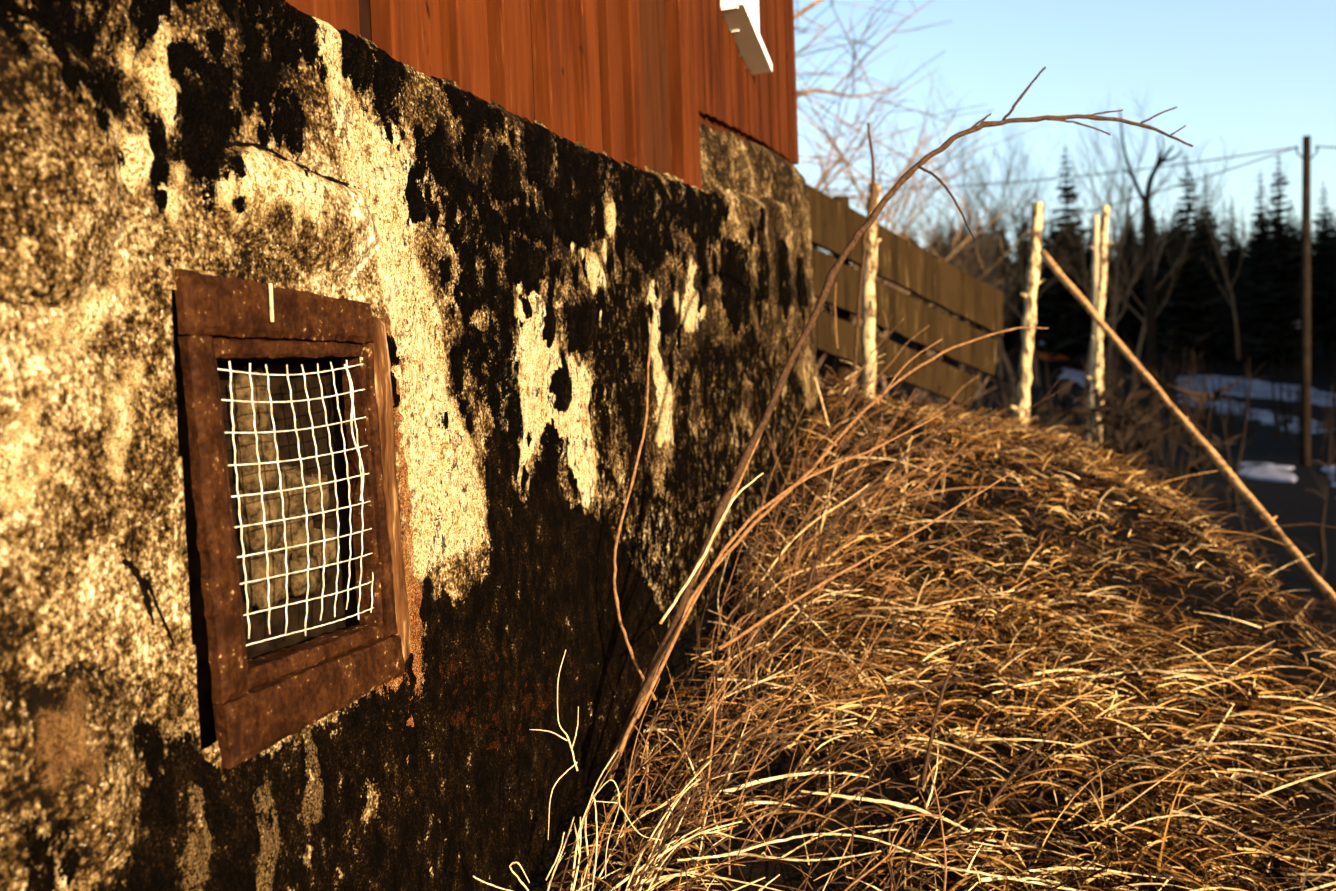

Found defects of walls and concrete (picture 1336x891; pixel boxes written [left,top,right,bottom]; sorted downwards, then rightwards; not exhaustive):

water stain [20,256,813,891]